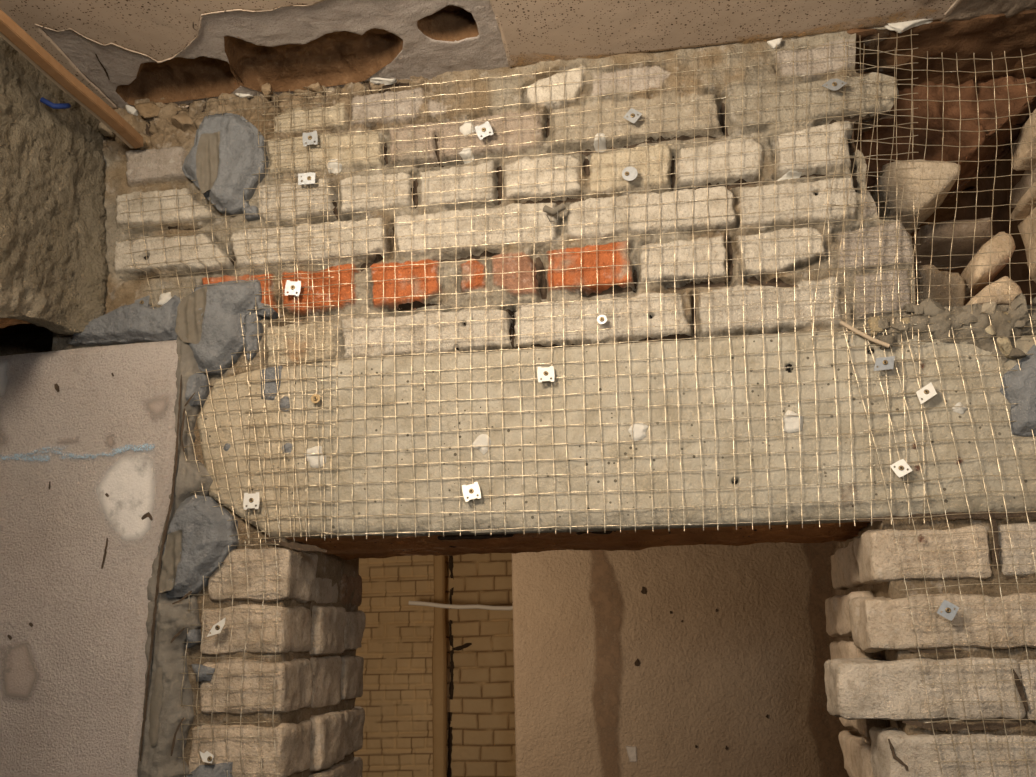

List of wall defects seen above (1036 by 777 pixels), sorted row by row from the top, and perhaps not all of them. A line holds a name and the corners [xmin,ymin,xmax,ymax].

peeling [35,0,511,116]
spalling [847,0,1036,307]
spalling [0,318,29,328]
damp [590,550,637,777]
damp [803,541,851,777]